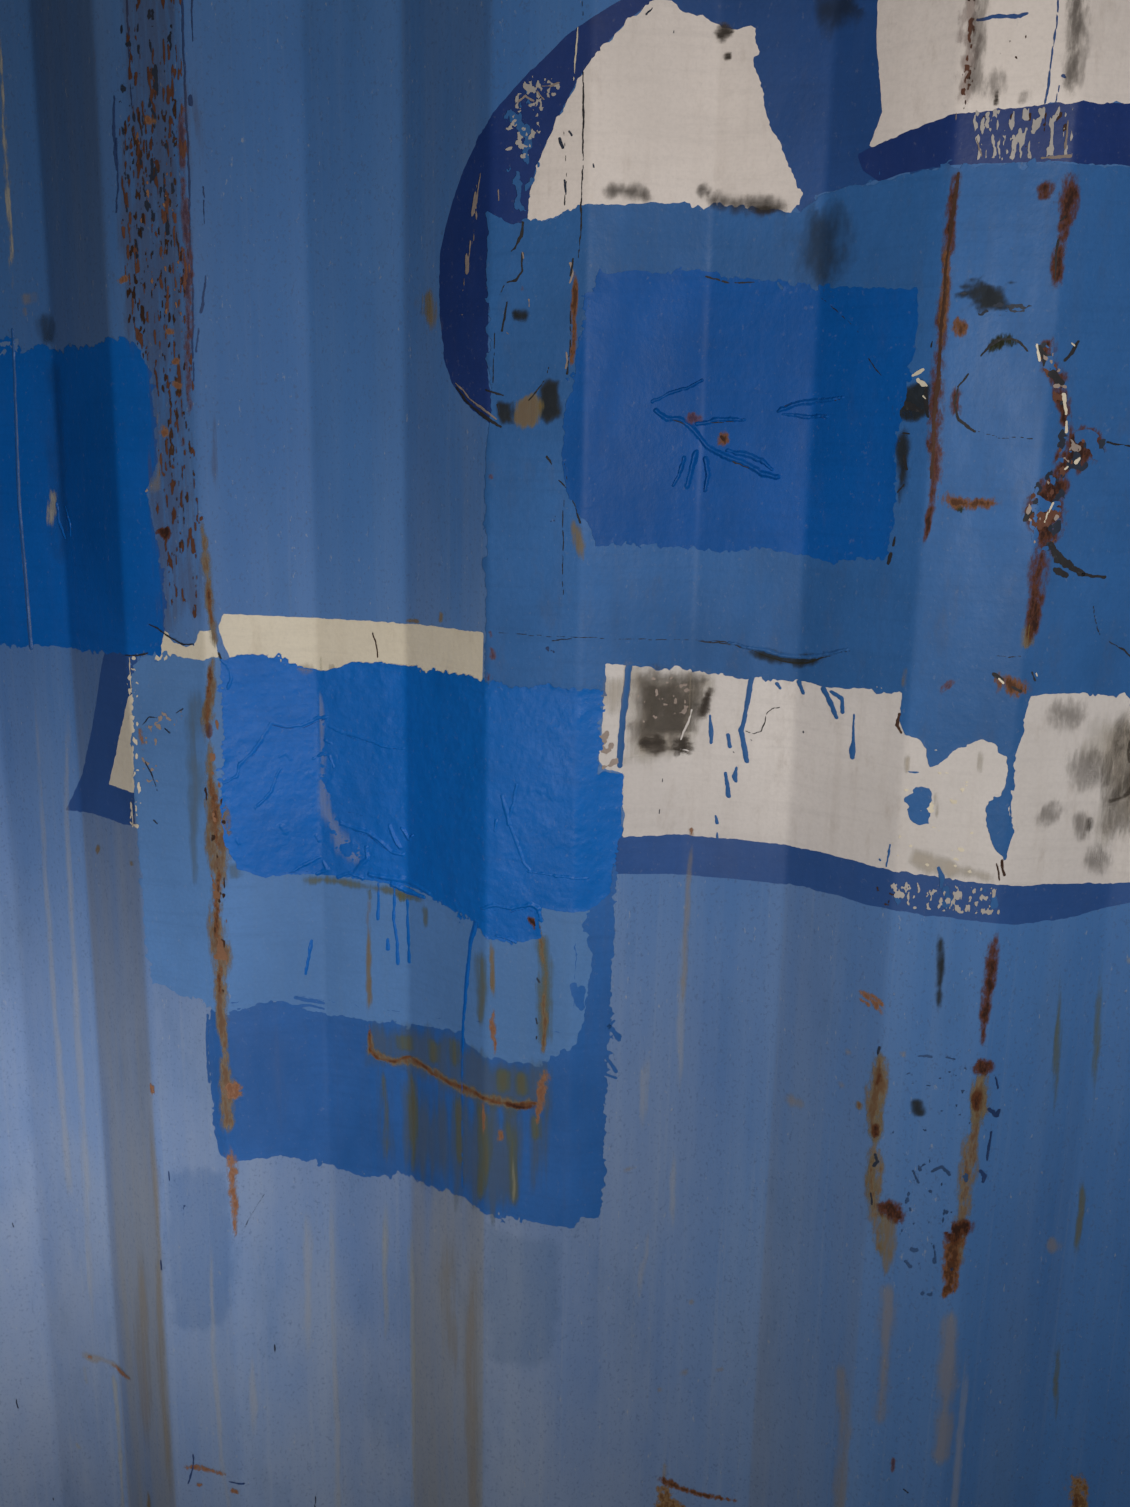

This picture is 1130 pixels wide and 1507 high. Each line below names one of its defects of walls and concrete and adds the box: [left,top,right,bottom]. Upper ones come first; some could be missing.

peeling [956,0,1073,160]
peeling [493,76,560,381]
corrosion [1038,177,1080,284]
peeling [498,352,568,427]
corrosion [923,172,995,540]
corrosion [112,0,243,1130]
peeling [877,832,1006,915]
corrosion [227,1151,239,1236]
corrosion [367,1031,548,1199]
corrosion [857,1046,904,1271]
corrosion [942,938,1001,1298]
corrosion [654,1477,736,1507]